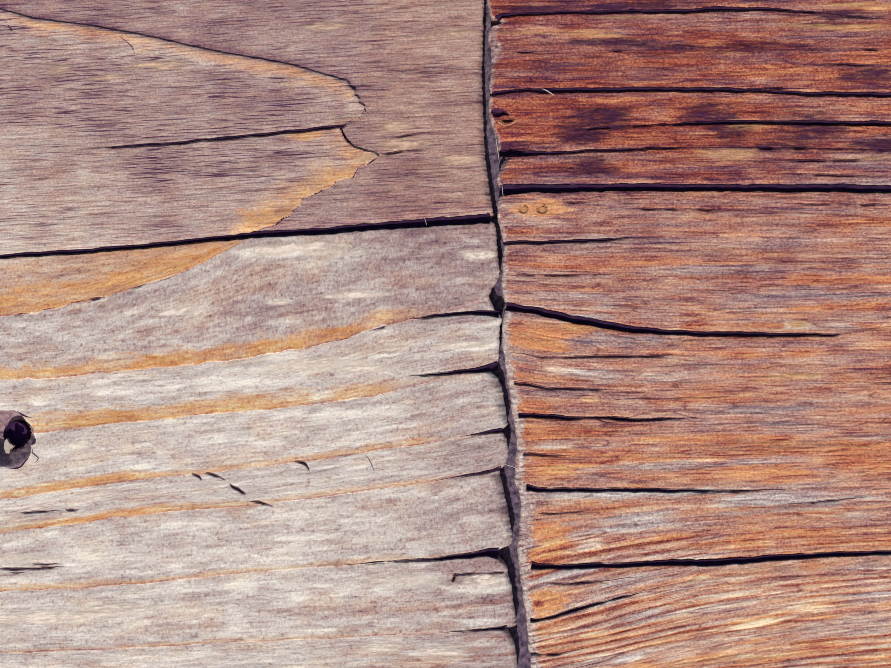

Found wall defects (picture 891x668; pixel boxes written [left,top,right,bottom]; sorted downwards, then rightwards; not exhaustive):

crack [783,48,879,65]
crack [492,87,891,97]
crack [98,123,355,149]
crack [382,132,428,154]
crack [499,121,891,212]
crack [0,213,491,258]
crack [503,236,634,244]
crack [506,303,853,358]